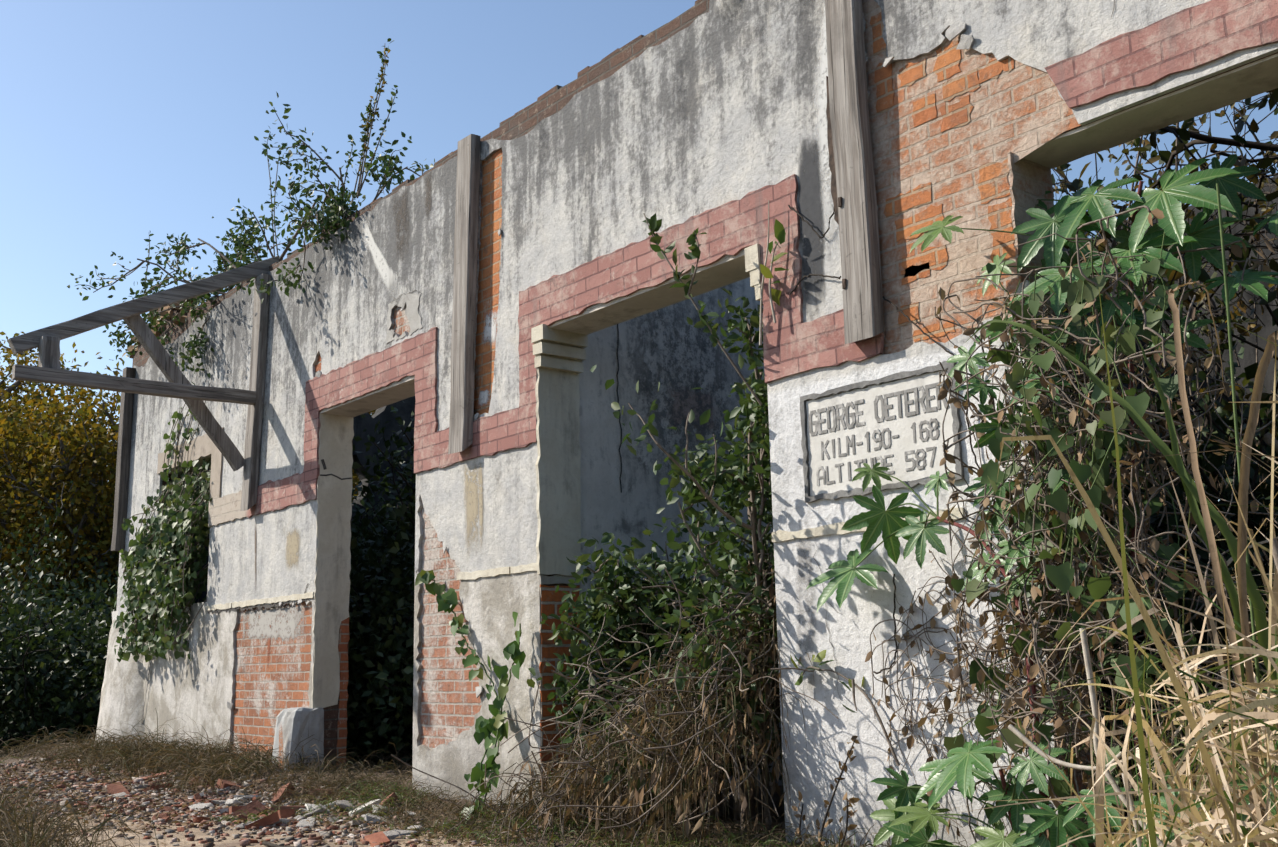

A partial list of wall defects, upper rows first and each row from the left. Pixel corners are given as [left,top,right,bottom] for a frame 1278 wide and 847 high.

peeling [474,150,502,418]
water stain [484,314,497,341]
water stain [798,141,824,304]
peeling [862,0,1081,355]
peeling [227,599,312,758]
peeling [415,502,483,750]